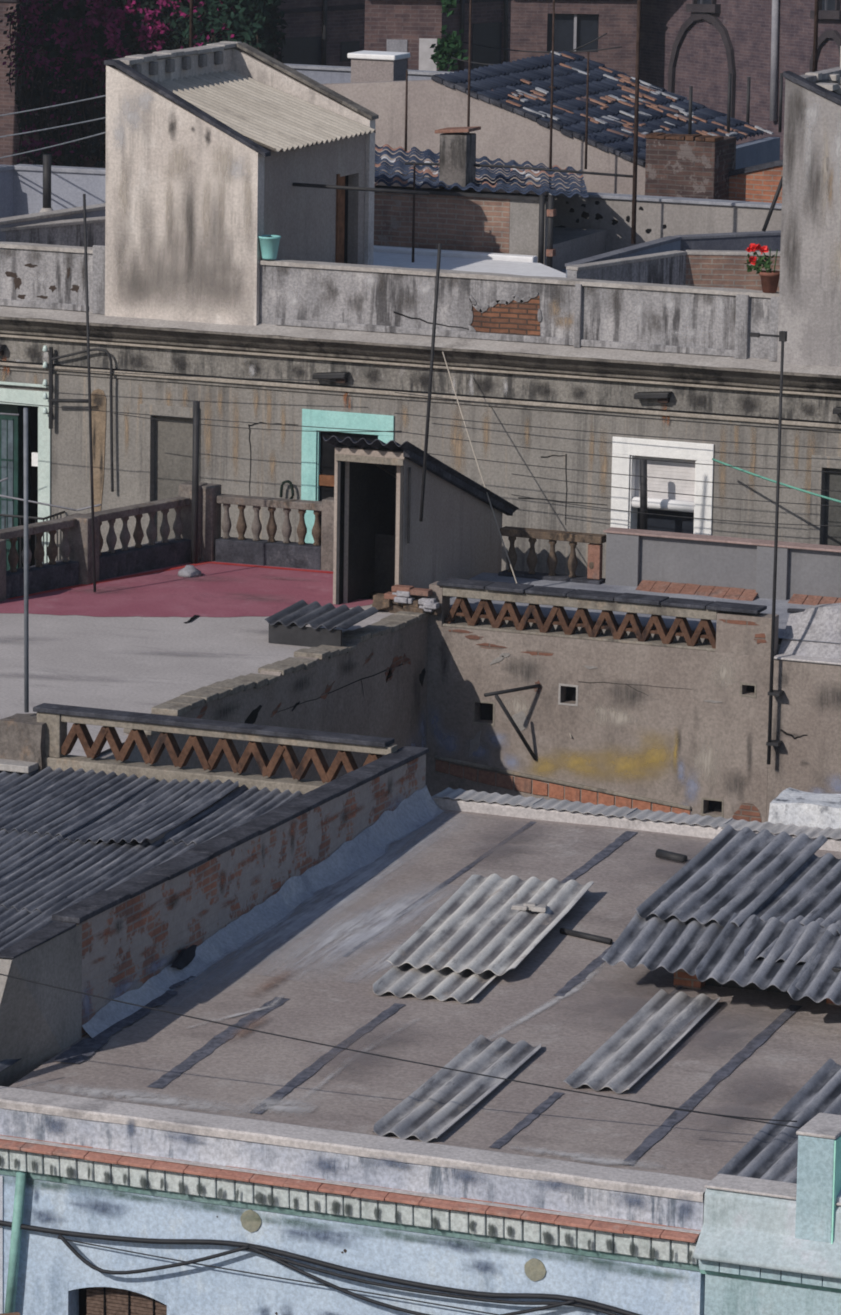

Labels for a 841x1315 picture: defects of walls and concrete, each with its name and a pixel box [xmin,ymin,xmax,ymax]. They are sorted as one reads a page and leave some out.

flaking render [467,293,542,336]